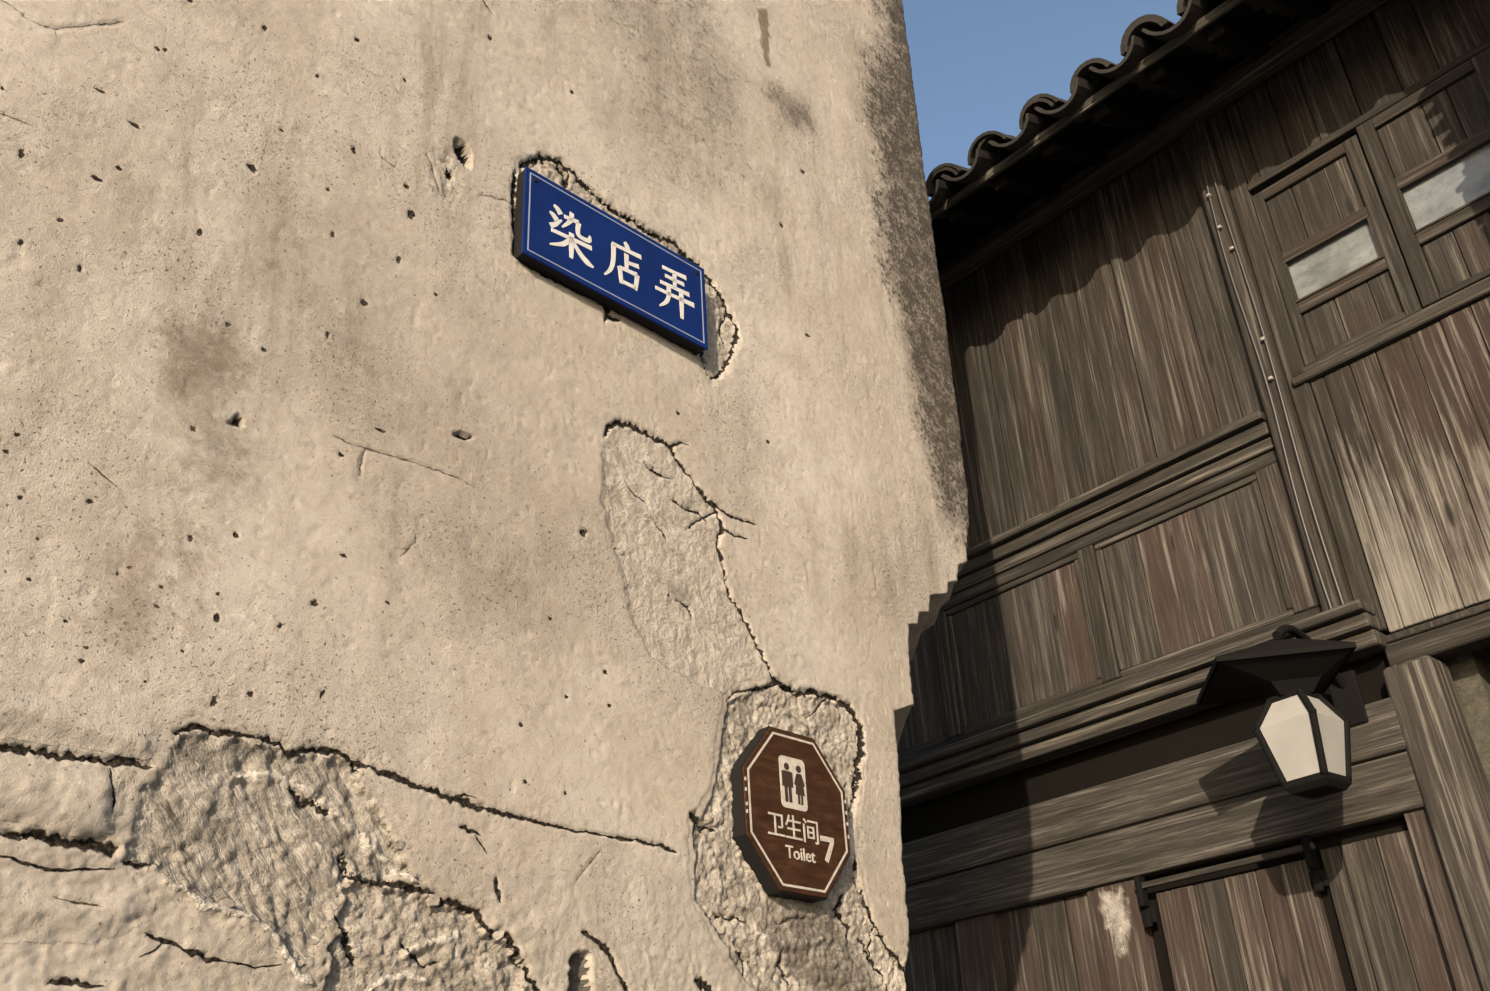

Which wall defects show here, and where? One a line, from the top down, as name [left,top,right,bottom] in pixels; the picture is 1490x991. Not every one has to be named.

flaking render [520,161,681,255]
flaking render [701,279,734,378]
damp [853,0,970,546]
flaking render [600,427,906,991]
crack [0,743,153,907]
flaking render [122,723,540,991]
crack [353,760,714,902]